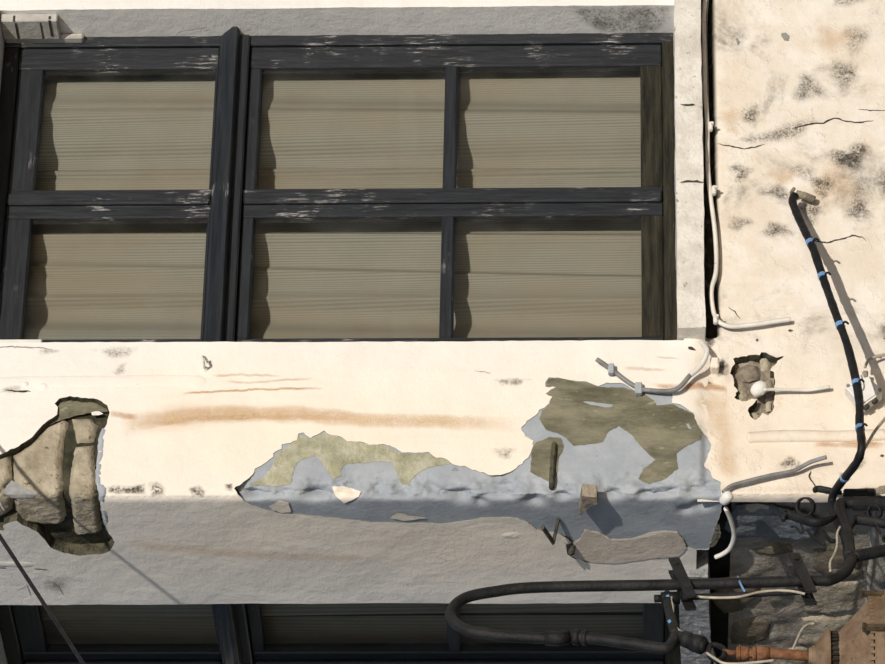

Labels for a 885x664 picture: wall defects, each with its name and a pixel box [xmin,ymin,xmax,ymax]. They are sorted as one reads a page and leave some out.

crack [796,118,867,128]
damp [835,146,866,167]
spalling [730,352,784,420]
spalling [0,396,114,556]
flaking render [234,377,722,564]